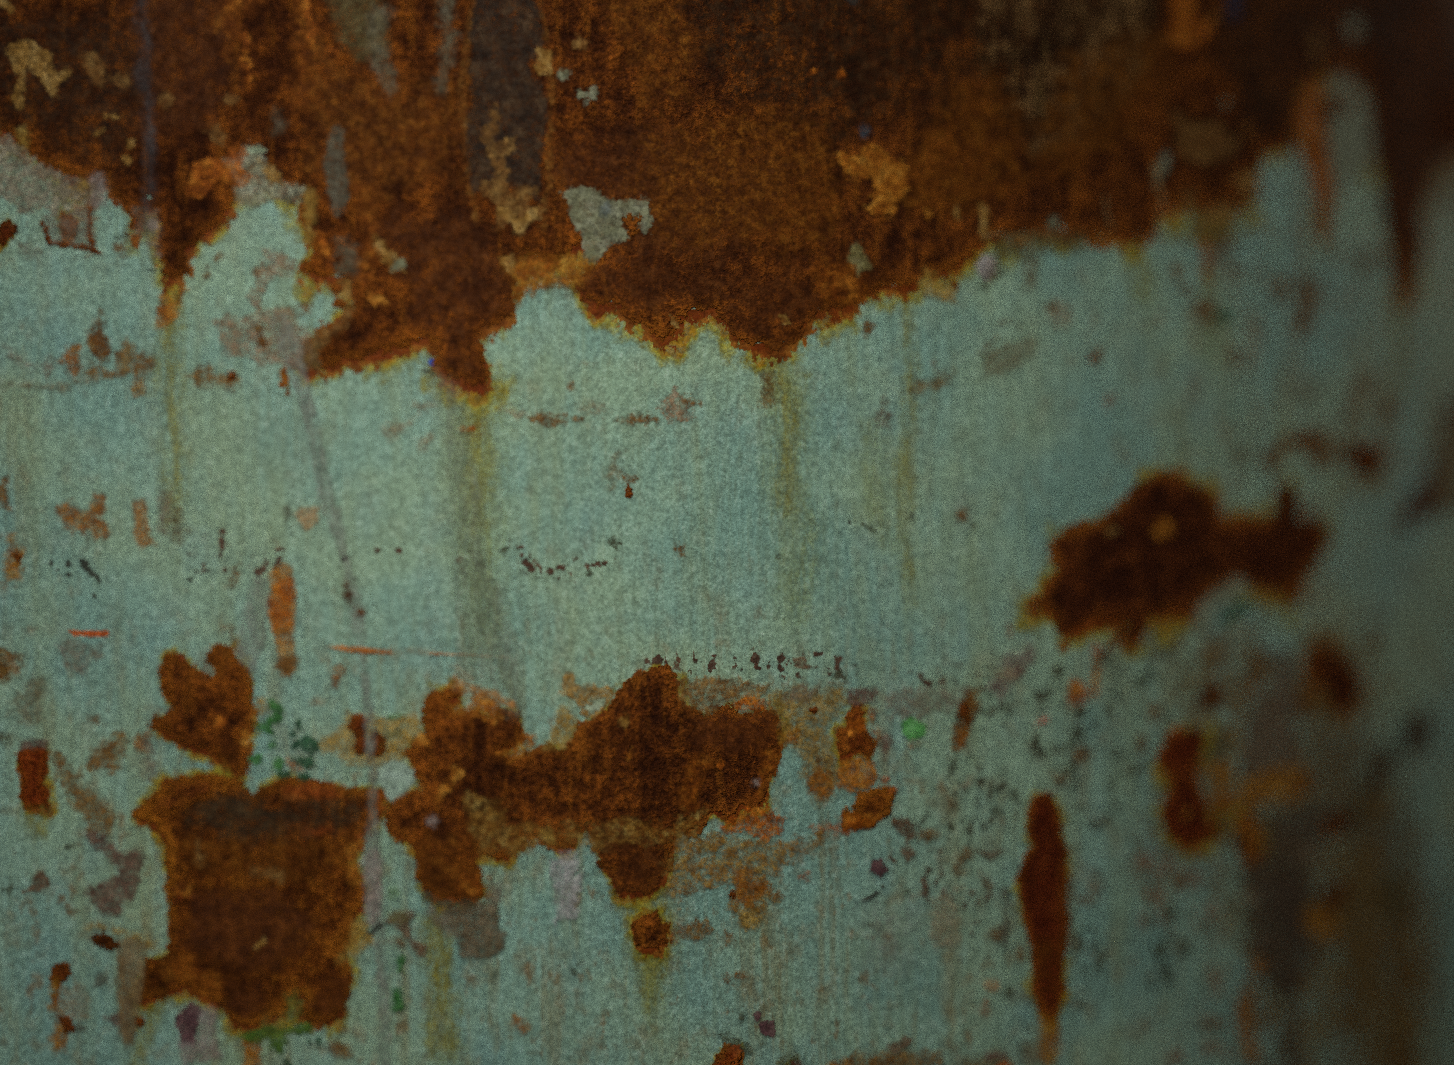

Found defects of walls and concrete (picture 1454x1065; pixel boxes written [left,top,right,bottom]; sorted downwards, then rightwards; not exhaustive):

corrosion [0,0,1454,547]
corrosion [1015,427,1388,726]
corrosion [0,640,983,1058]
corrosion [712,1034,752,1065]
corrosion [831,1036,1012,1065]
corrosion [983,790,1073,1065]
corrosion [1152,720,1270,870]